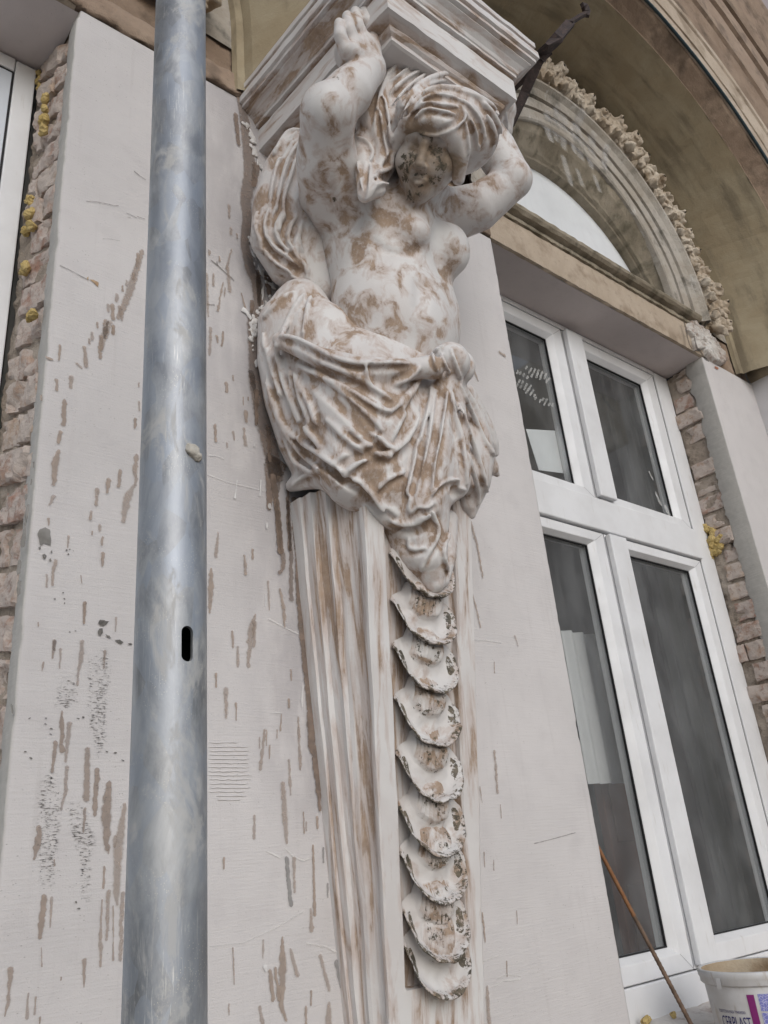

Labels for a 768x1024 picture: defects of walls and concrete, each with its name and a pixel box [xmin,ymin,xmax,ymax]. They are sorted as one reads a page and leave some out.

spalling [16,461,52,597]
spalling [98,620,132,645]